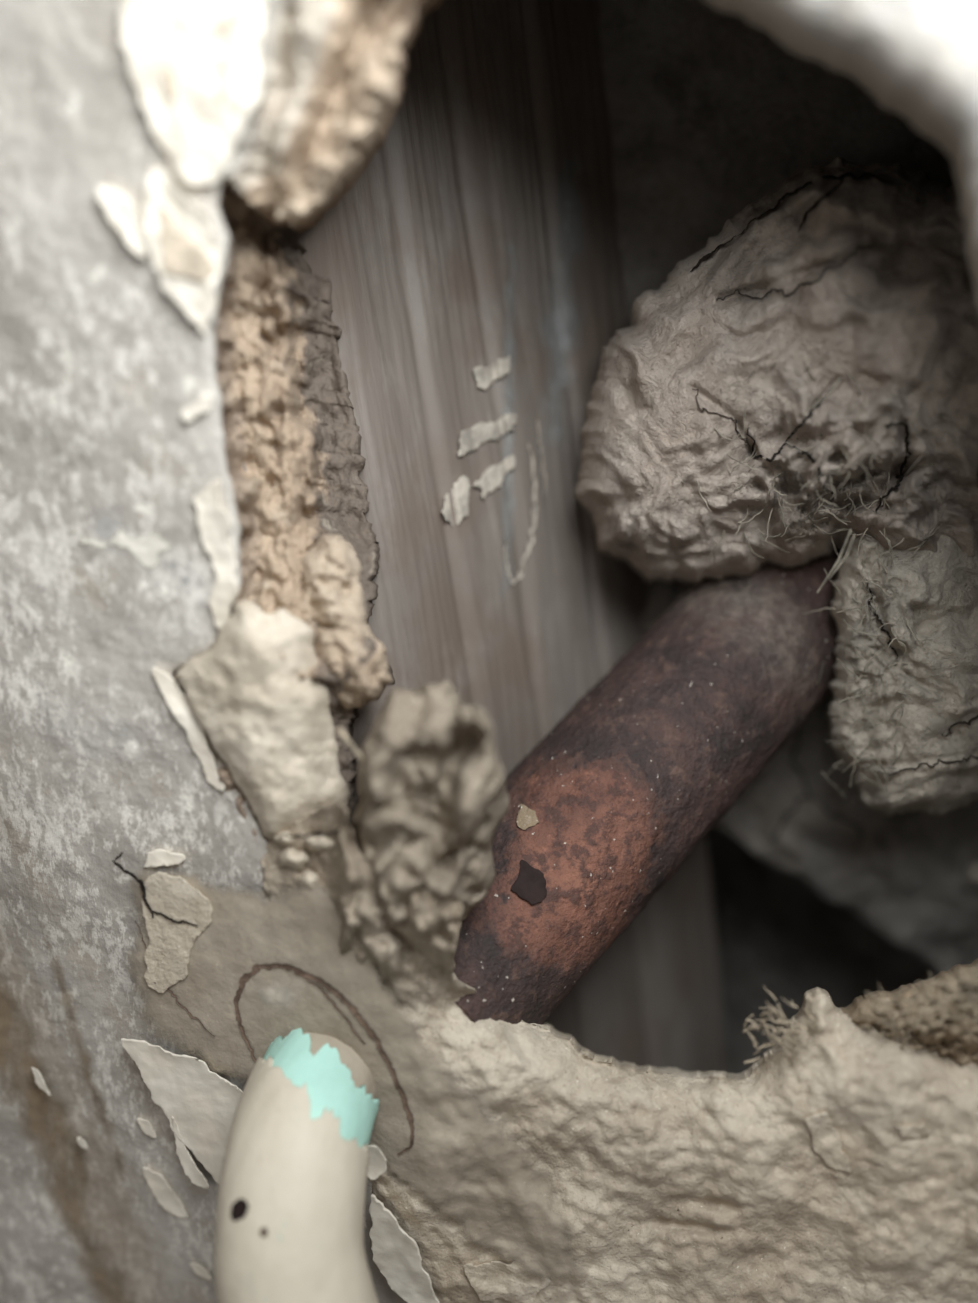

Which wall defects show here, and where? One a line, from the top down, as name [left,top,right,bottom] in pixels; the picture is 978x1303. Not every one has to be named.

flaking render [97,0,442,840]
crack [112,852,198,949]
flaking render [141,849,213,993]
peeling [31,1067,51,1096]
peeling [121,1038,243,1189]
flaking render [260,801,978,1303]
peeling [142,1167,189,1218]
peeling [230,1198,249,1221]